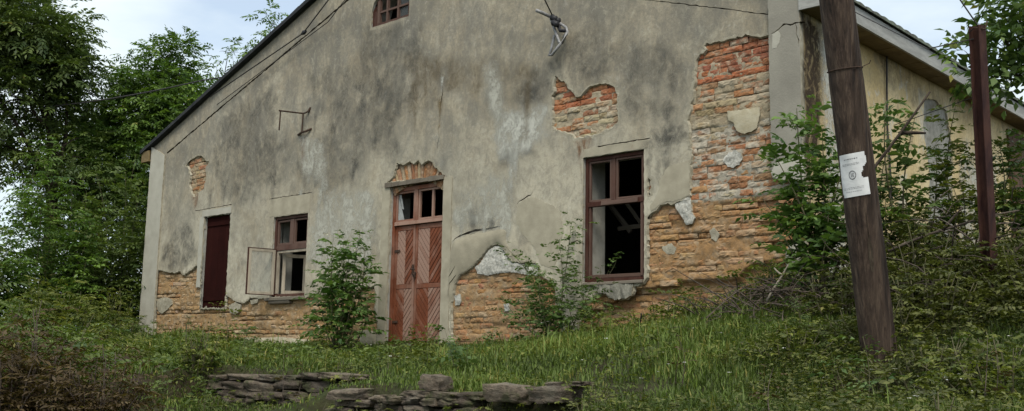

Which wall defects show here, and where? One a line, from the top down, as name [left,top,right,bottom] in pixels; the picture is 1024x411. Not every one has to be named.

flaking render [185,154,210,198]
damp [302,135,376,277]
flaking render [387,158,443,197]
damp [453,67,548,235]
flaking render [449,30,809,345]
flaking render [154,263,378,345]